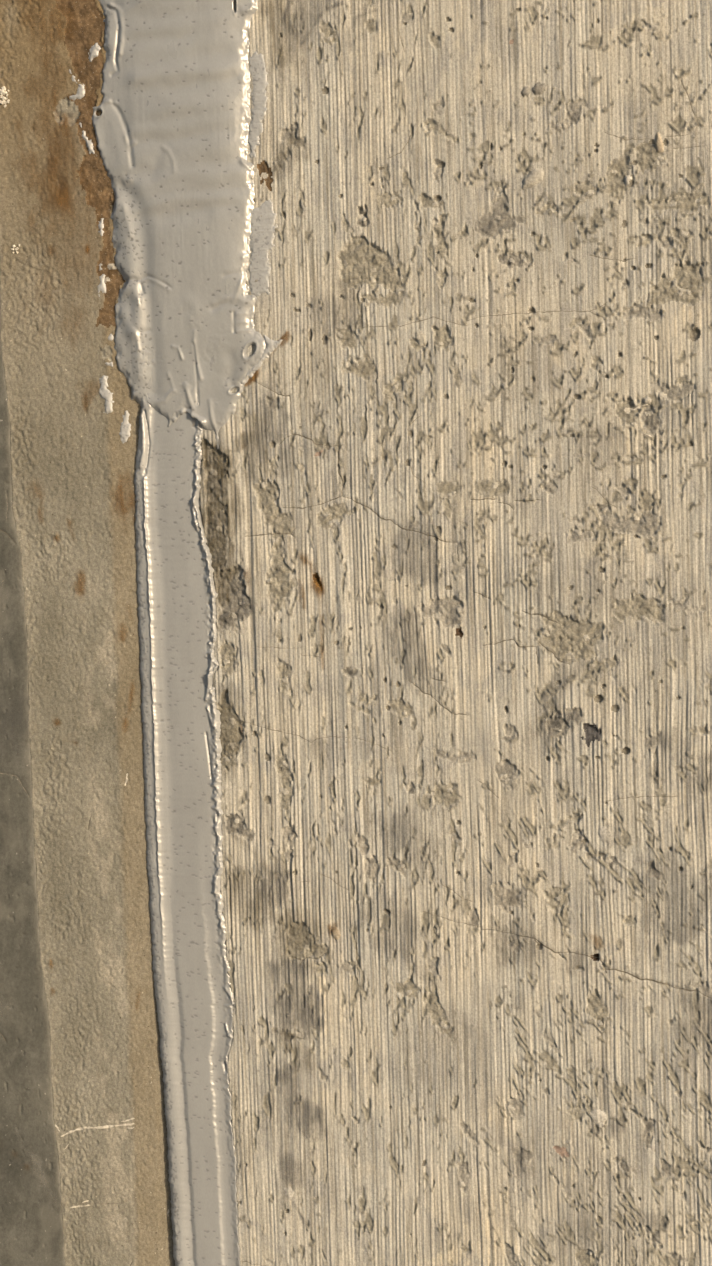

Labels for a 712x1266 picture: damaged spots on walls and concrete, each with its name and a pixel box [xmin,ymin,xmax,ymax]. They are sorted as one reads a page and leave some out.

crack [245,381,459,561]
rust [313,578,324,594]
crack [422,884,712,999]